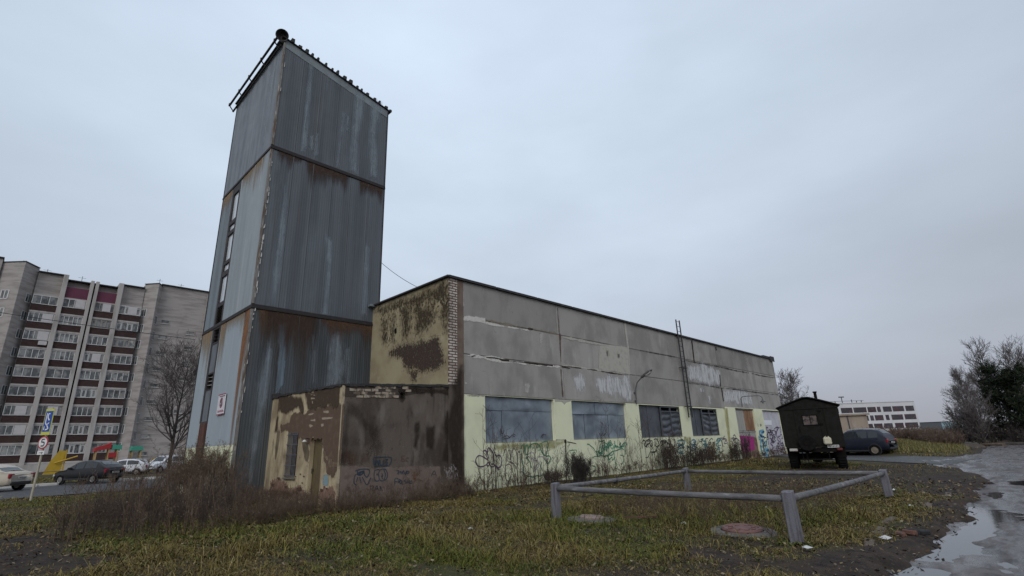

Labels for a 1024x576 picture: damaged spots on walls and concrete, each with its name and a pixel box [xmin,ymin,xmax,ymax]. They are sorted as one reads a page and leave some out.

rust [279,151,347,187]
rust [360,181,383,199]
water stain [363,280,464,342]
rust [202,308,372,431]
flaking render [280,328,446,507]